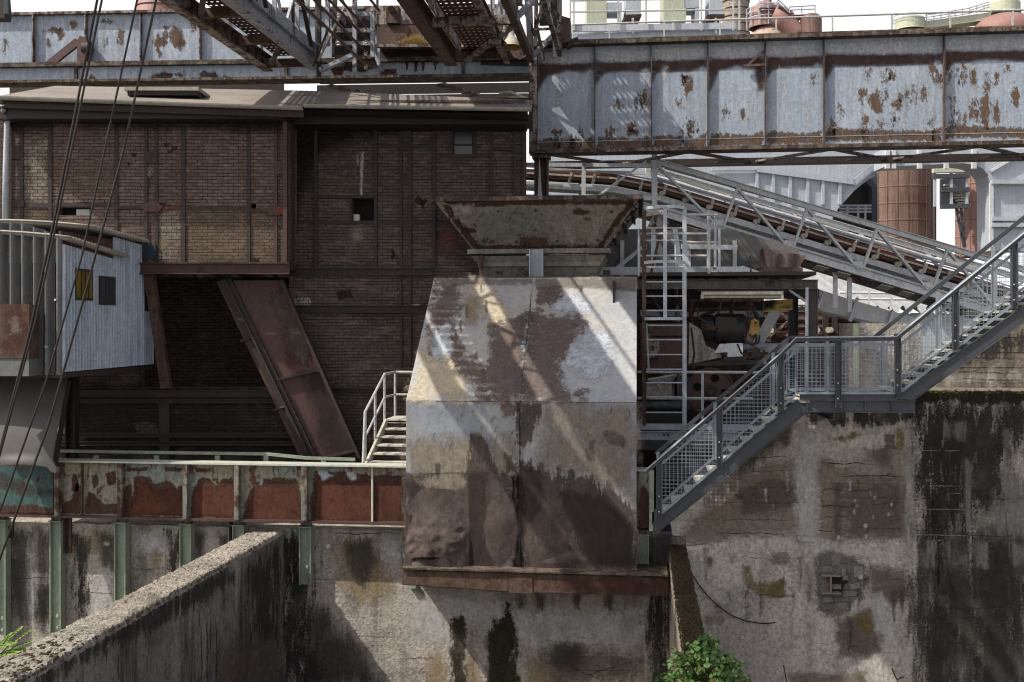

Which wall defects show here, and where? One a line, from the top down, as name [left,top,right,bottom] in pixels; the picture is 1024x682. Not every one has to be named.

rust [43,20,77,47]
rust [101,18,125,47]
rust [152,22,196,58]
rust [538,50,1024,150]
rust [442,200,635,249]
damp [11,527,49,635]
damp [36,528,379,682]
damp [468,473,492,566]
damp [412,583,669,682]
damp [562,491,636,567]
peeling [814,447,957,618]
damp [806,400,1024,682]